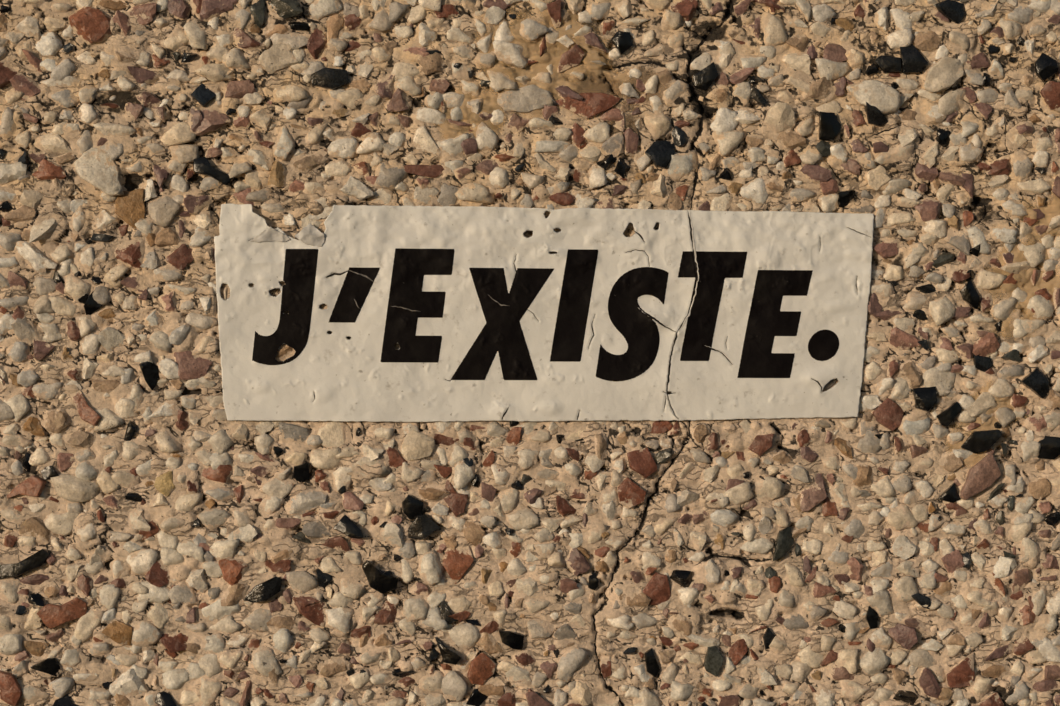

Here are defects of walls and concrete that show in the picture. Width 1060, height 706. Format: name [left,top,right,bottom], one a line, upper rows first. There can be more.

crack [605,3,733,210]
crack [592,420,690,706]
crack [696,549,772,565]